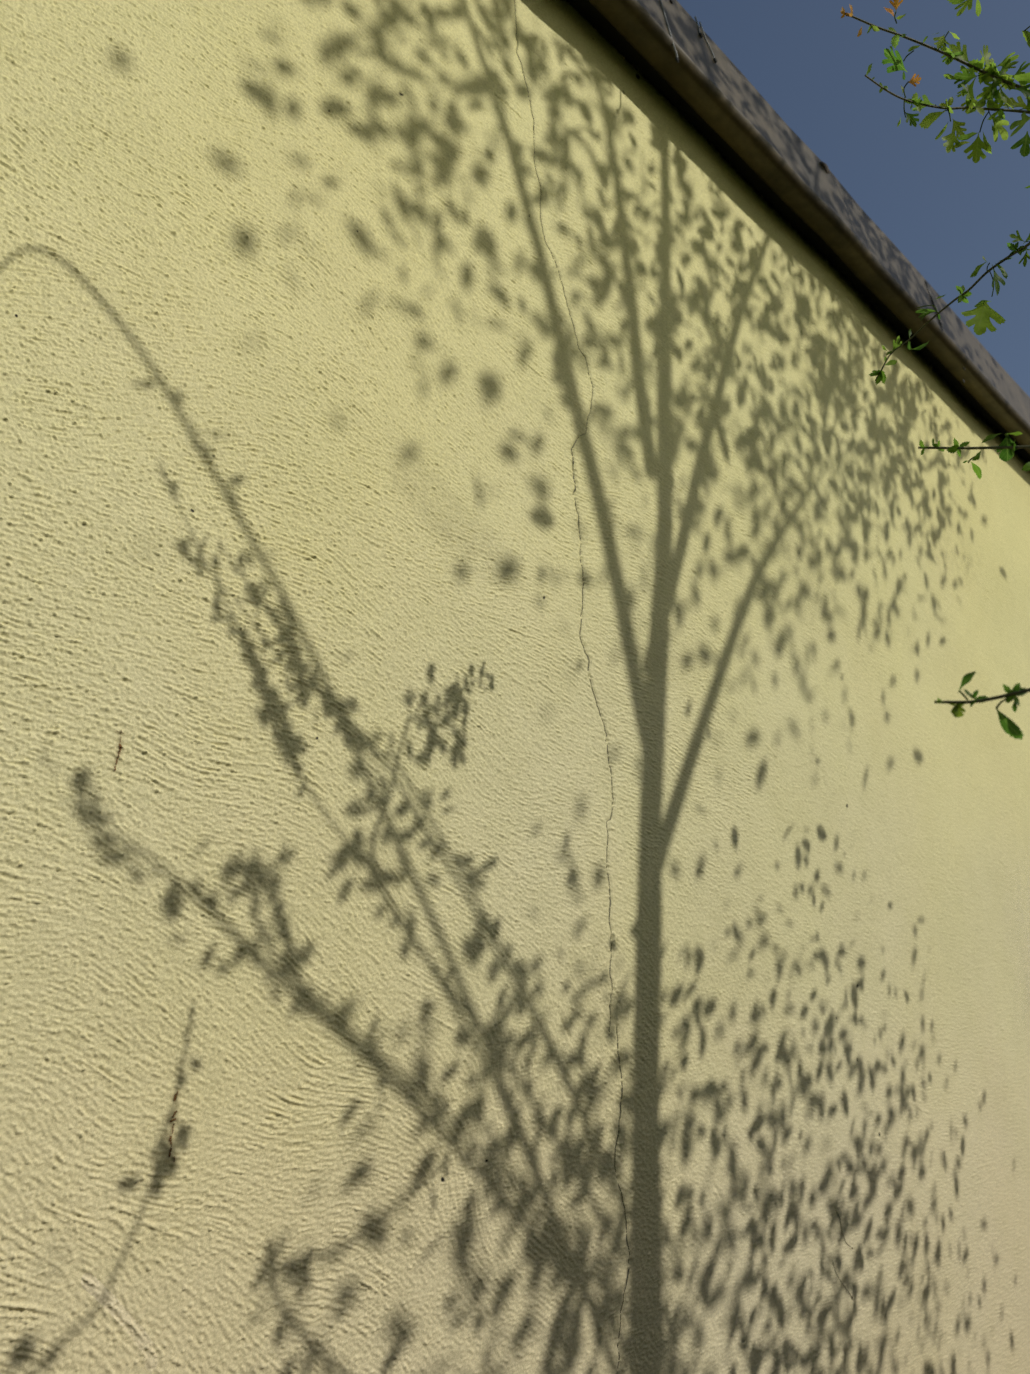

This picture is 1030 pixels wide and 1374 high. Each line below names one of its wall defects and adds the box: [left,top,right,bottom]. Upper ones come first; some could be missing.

crack [514,0,630,1373]